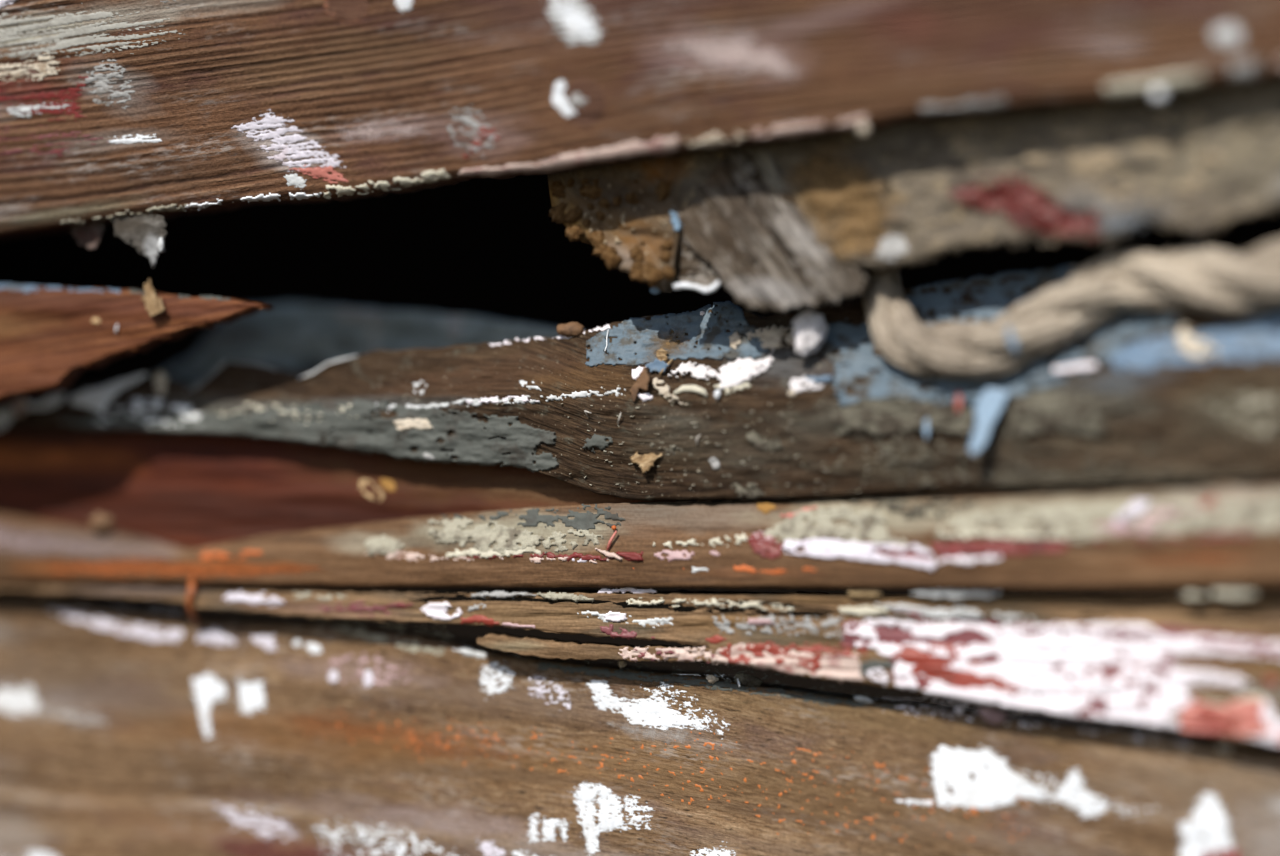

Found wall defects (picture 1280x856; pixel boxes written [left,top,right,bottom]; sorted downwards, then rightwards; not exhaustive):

peeling [395,0,413,12]
peeling [0,0,184,157]
peeling [551,80,588,117]
peeling [876,234,912,263]
peeling [906,263,1088,324]
peeling [0,301,794,473]
peeling [788,308,1280,455]
peeling [362,483,1280,574]
peeling [49,604,277,651]
peeling [223,587,1280,748]
peeling [190,673,266,738]